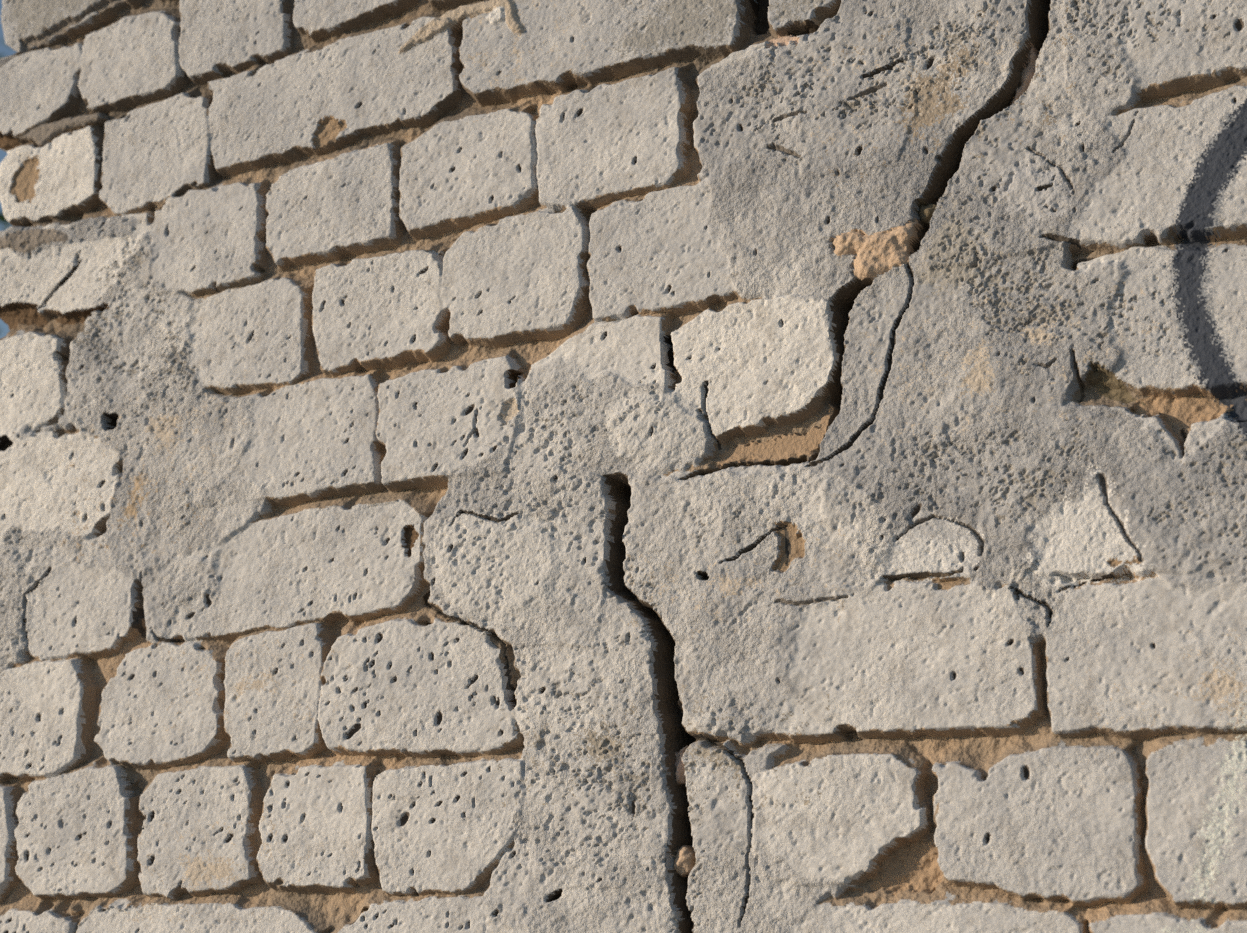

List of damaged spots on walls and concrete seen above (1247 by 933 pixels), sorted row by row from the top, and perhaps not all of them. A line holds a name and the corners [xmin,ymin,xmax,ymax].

peeling [0,112,111,203]
spalling [312,115,347,151]
crack [38,259,82,309]
crack [680,0,1051,480]
crack [721,525,791,566]
crack [882,513,985,581]
crack [1010,473,1144,624]
crack [603,472,754,933]